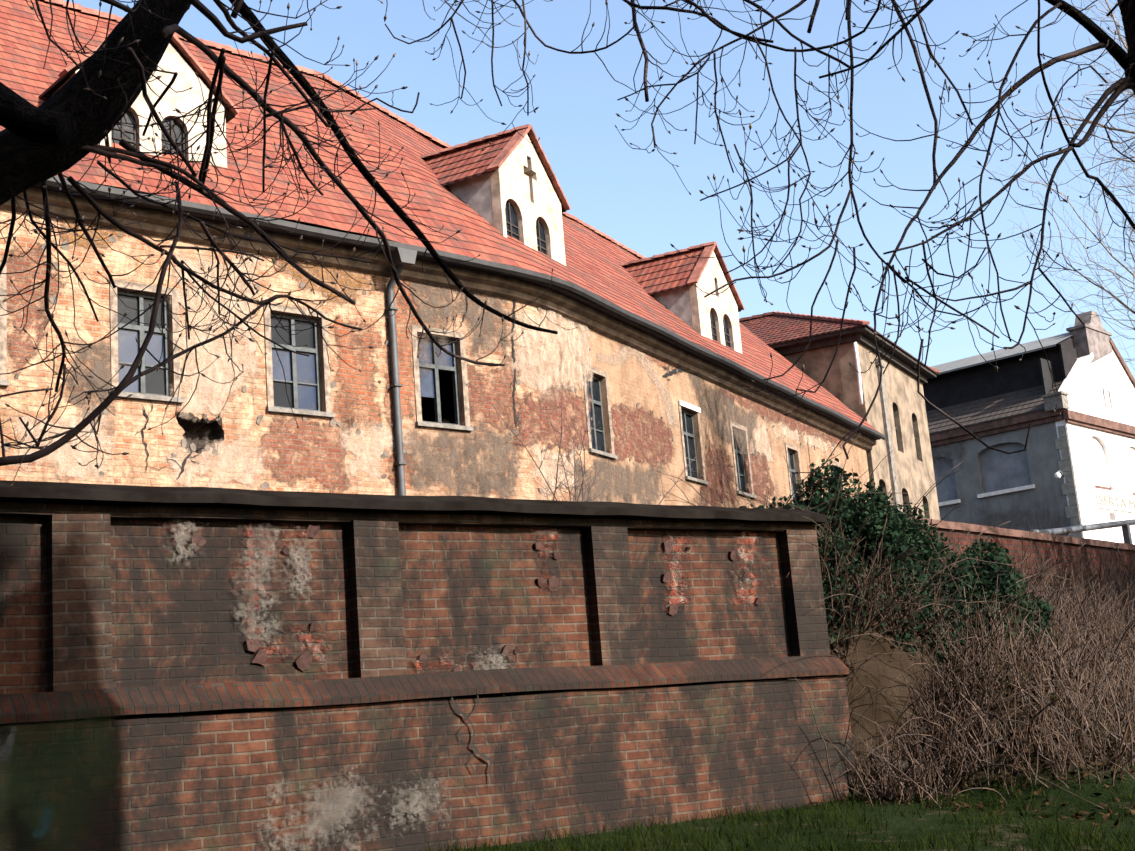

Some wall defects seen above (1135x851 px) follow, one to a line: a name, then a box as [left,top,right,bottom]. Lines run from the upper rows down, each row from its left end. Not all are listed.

spalling [171,409,226,458]
damp [239,530,279,639]